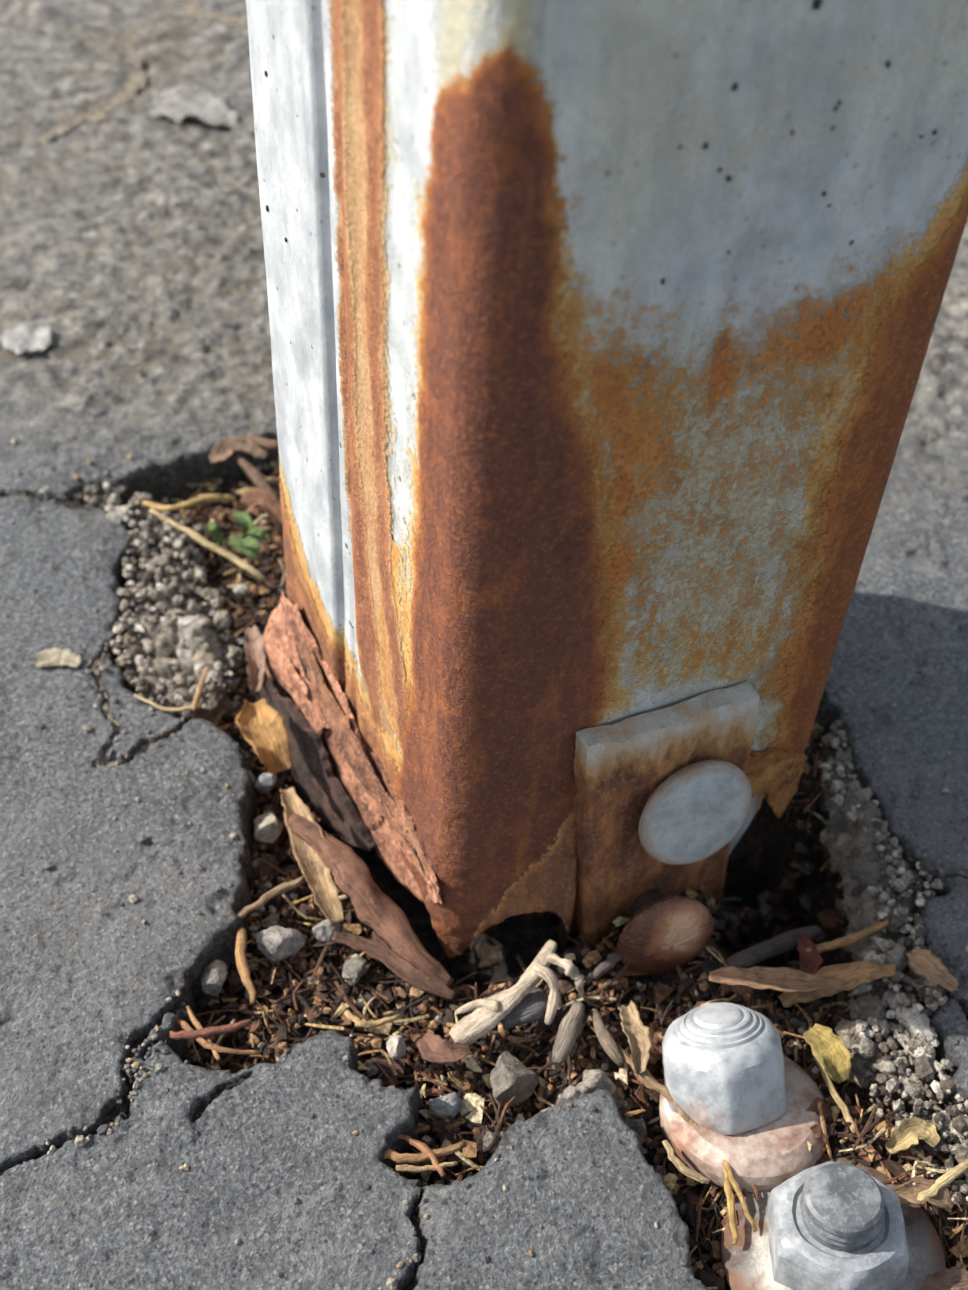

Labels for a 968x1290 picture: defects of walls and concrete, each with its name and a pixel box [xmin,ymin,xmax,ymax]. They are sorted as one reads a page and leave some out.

corrosion [255,0,968,957]
crack [7,1000,186,1170]
crack [194,1077,245,1118]
crack [401,1194,426,1290]